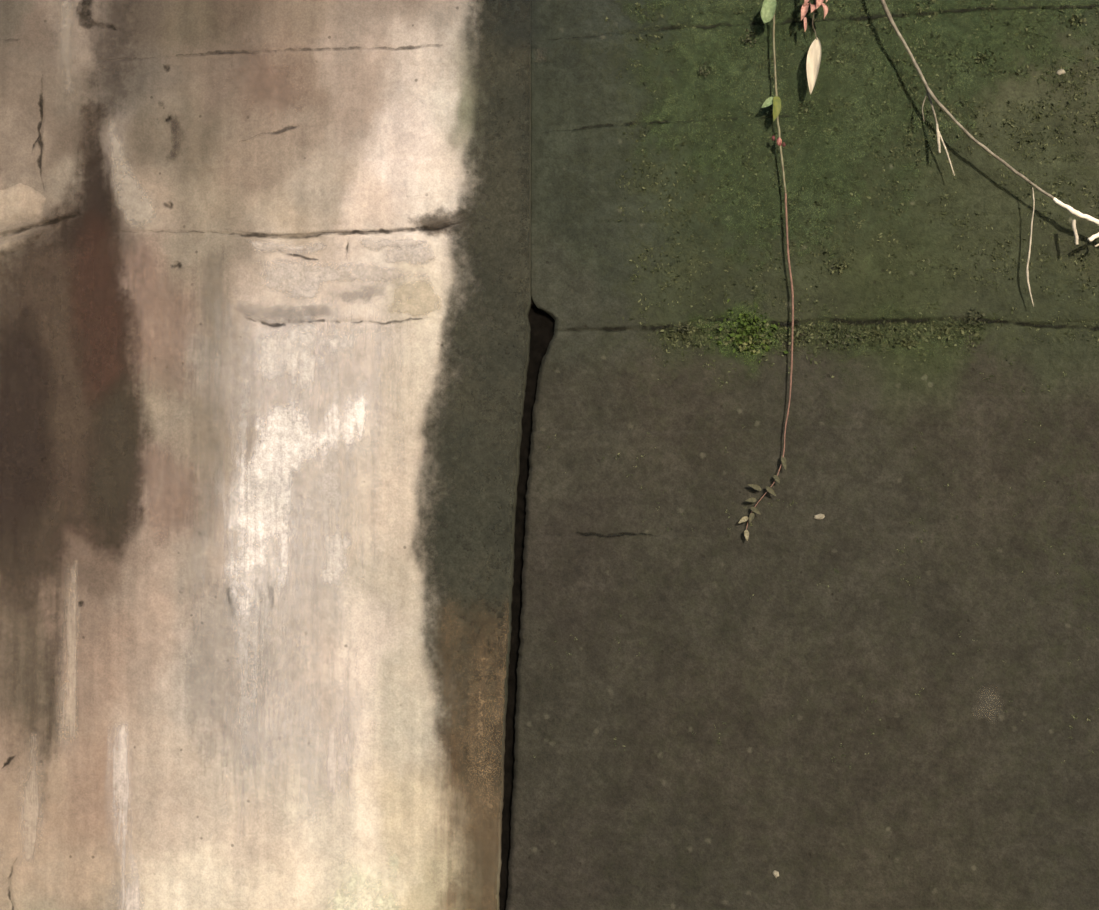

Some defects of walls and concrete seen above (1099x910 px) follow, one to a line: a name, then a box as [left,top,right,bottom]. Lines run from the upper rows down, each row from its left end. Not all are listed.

crack [77,0,116,30]
crack [15,215,76,233]
damp [417,211,464,235]
crack [233,224,455,260]
crack [603,323,673,331]
crack [831,317,929,325]
crack [977,317,1099,330]
damp [0,106,155,860]
efflorescence [229,317,379,744]
crack [577,530,650,538]
crack [499,296,576,910]
damp [444,611,509,910]